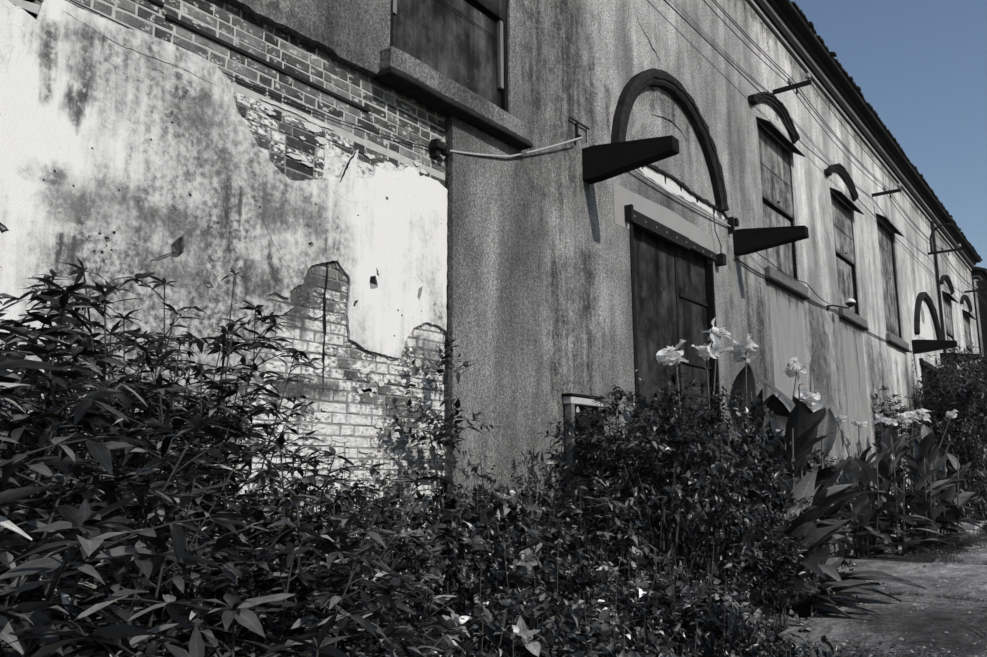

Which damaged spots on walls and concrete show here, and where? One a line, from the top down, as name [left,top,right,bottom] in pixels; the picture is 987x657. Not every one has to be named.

spalling [8,0,44,15]
damp [42,28,57,70]
damp [66,28,104,126]
spalling [65,0,446,202]
damp [56,233,80,265]
damp [51,173,95,218]
damp [220,187,242,263]
damp [243,260,281,297]
damp [259,183,335,254]
damp [284,264,318,329]
spalling [204,261,445,537]